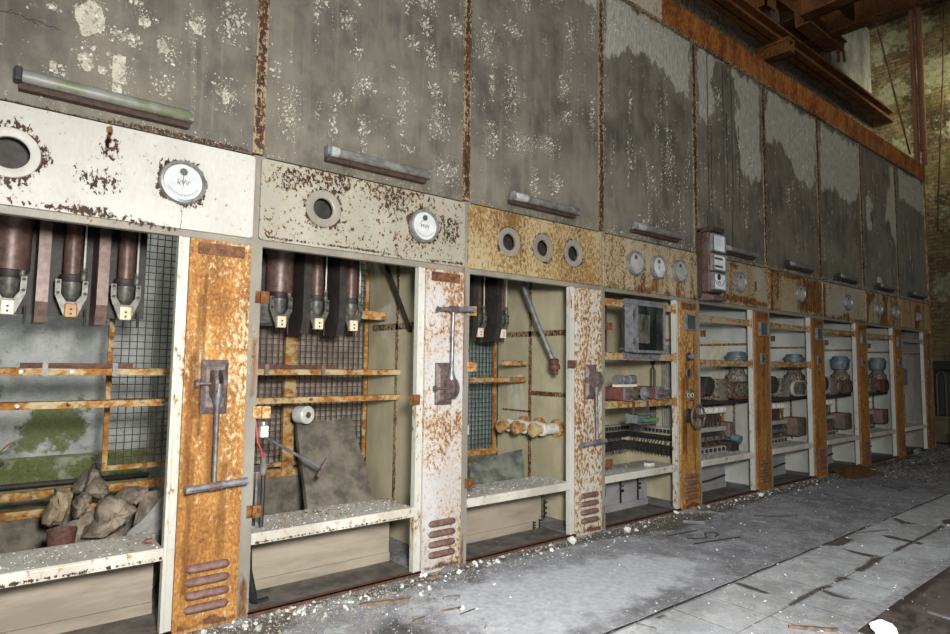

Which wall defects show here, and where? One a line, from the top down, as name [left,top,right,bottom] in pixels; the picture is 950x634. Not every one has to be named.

crack [0,9,62,31]
peeling [42,0,182,100]
peeling [185,1,252,50]
corrosion [0,0,269,232]
corrosion [463,0,472,197]
damp [580,0,873,242]
damp [885,164,924,246]
corrosion [497,226,584,267]
corrosion [183,276,226,594]
corrosion [203,615,227,624]
corrosion [239,580,247,617]